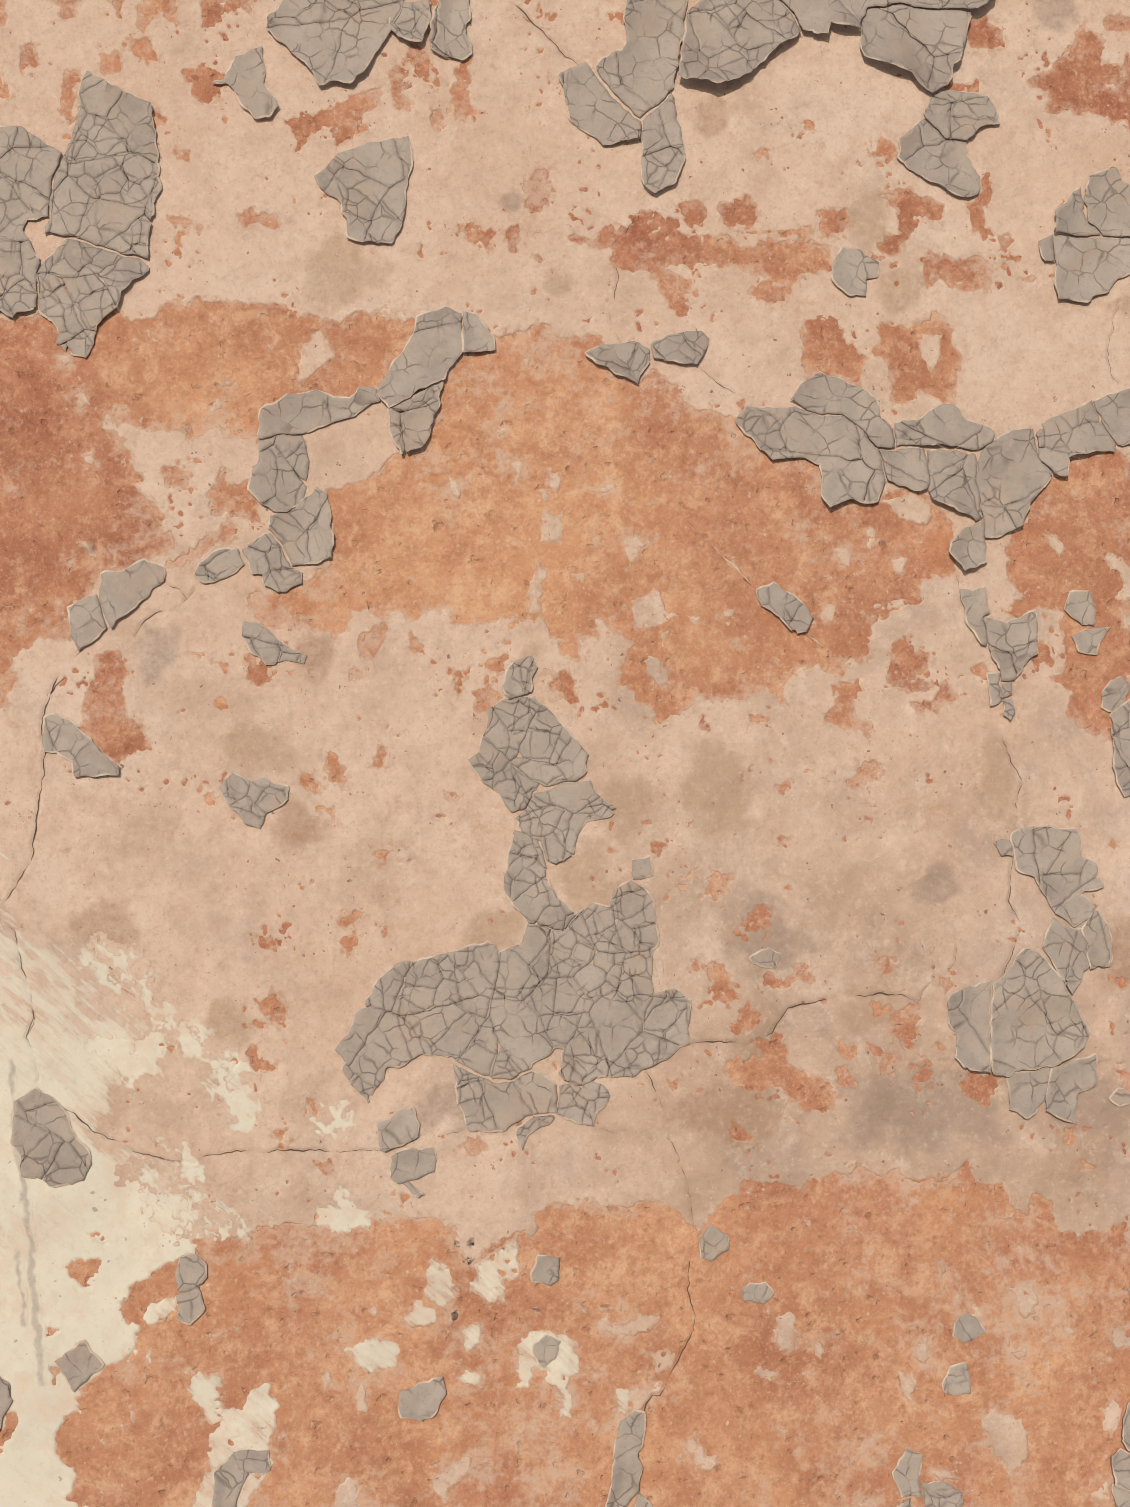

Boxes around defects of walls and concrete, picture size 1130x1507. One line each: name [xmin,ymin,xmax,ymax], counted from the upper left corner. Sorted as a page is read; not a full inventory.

flaking render [0,0,1130,1171]
peeling [10,1087,91,1188]
flaking render [49,1106,1130,1507]
crack [696,950,957,1043]